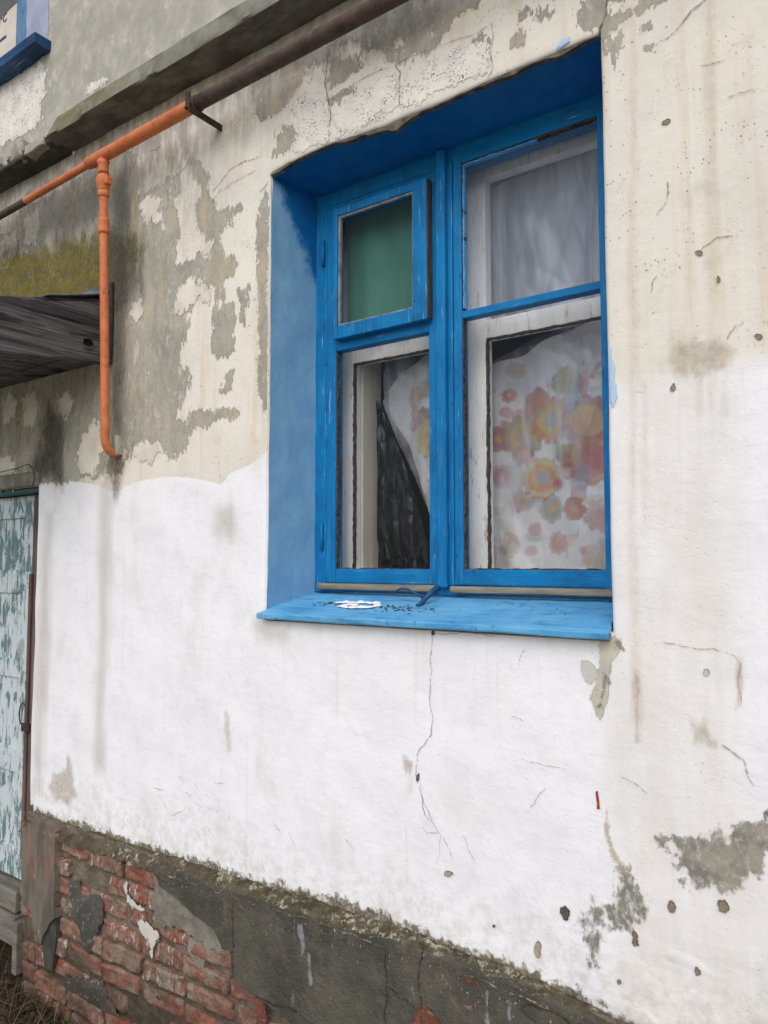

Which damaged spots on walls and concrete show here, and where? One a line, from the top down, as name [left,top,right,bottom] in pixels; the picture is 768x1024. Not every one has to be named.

peeling [0,0,667,486]
water stain [34,412,62,481]
peeling [581,635,625,720]
crack [415,632,486,858]
spalling [655,811,768,913]